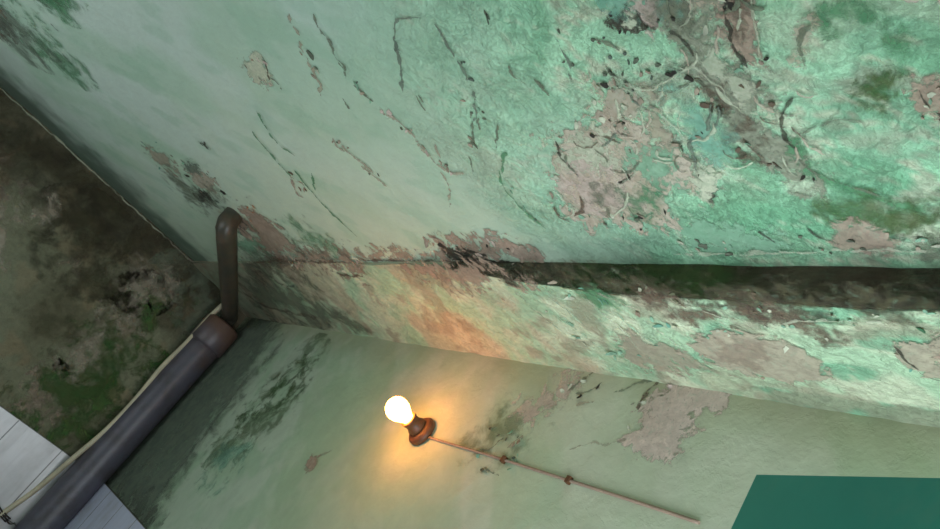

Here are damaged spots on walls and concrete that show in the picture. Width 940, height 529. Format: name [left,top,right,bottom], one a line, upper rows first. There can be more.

peeling [851,65,940,121]
peeling [529,0,827,259]
peeling [143,142,226,208]
spalling [394,229,557,298]
peeling [563,287,679,328]
spalling [605,327,833,464]